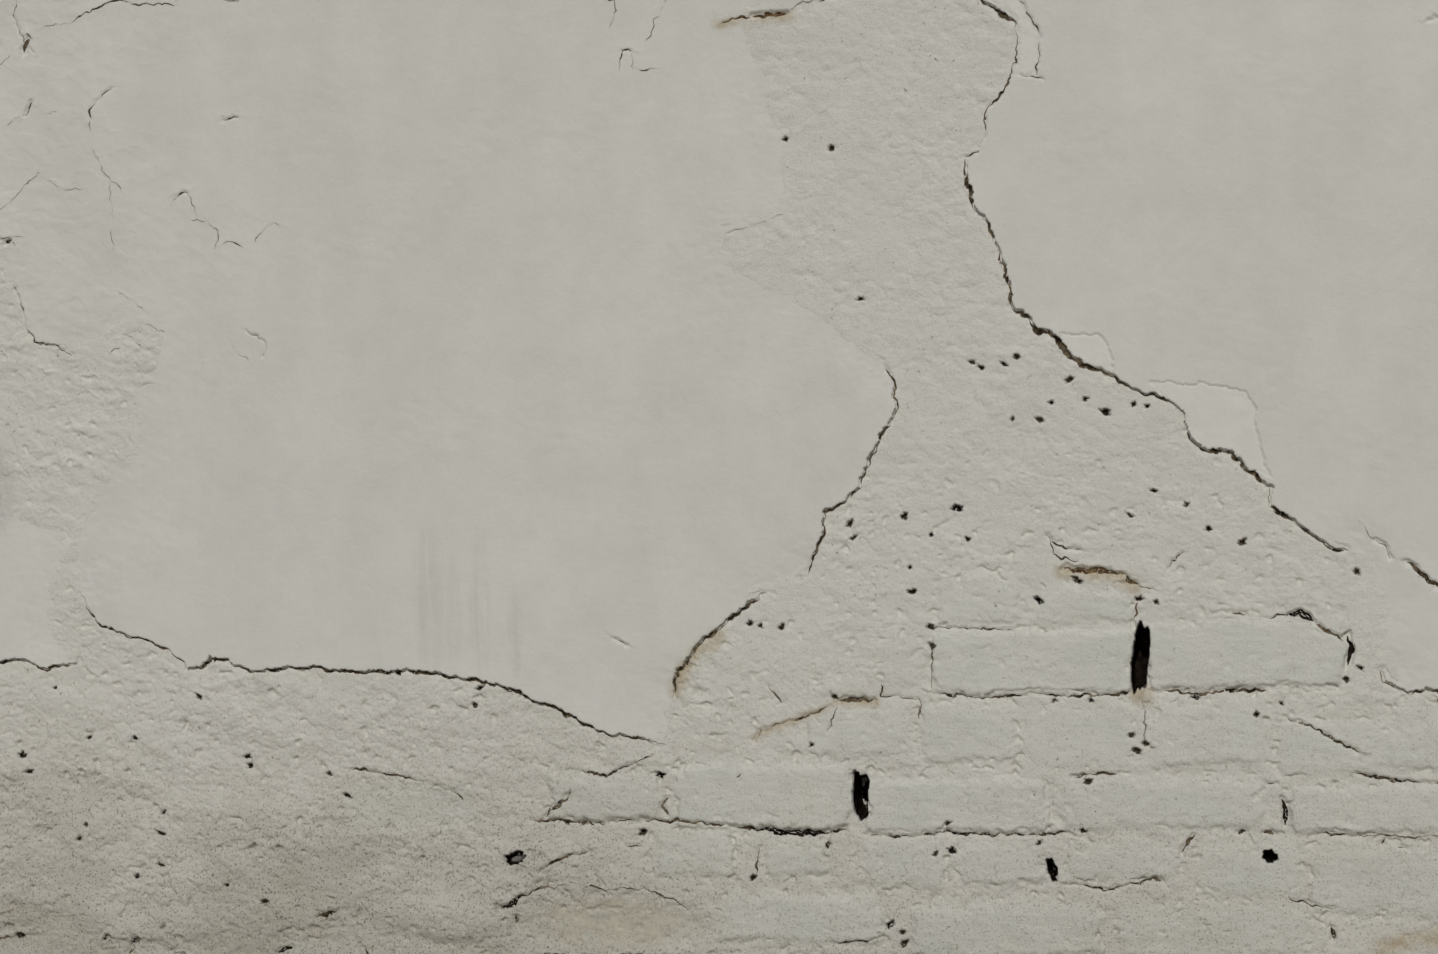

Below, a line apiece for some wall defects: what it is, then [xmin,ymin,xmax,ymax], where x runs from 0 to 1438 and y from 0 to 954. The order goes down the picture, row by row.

crack [2,0,176,63]
crack [608,0,666,71]
crack [721,12,787,24]
crack [1020,1,1042,78]
spalling [963,161,974,208]
crack [174,192,278,248]
spalling [998,251,1013,306]
spalling [1030,322,1113,377]
spalling [0,247,165,551]
spalling [886,370,899,414]
spalling [1152,381,1268,475]
spalling [1226,450,1262,483]